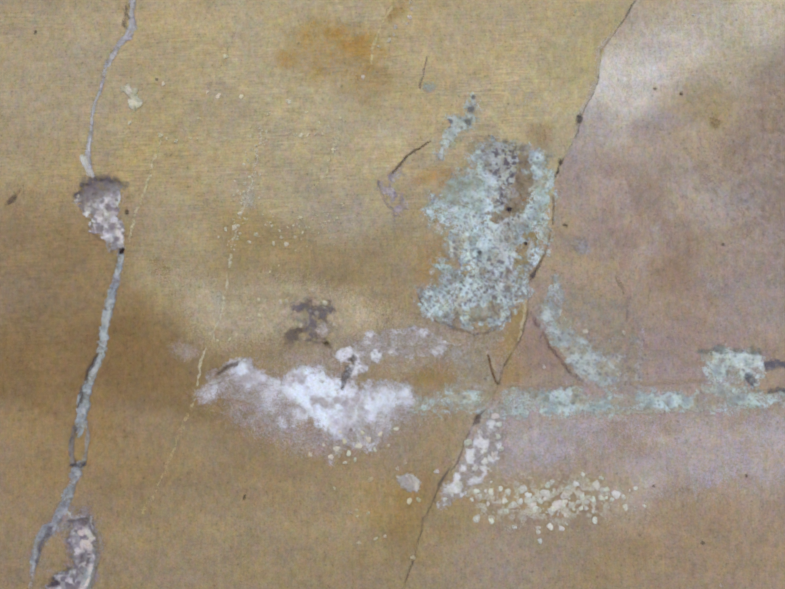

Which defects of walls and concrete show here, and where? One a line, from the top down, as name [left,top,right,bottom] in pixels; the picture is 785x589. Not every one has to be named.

crack [28,140,161,589]
spalling [72,172,130,254]
crack [79,0,139,179]
water stain [0,175,525,482]
spalling [245,287,348,361]
crack [387,140,431,176]
crack [404,1,637,583]
peeling [409,89,785,544]
spalling [25,503,106,589]
flaking render [396,460,421,505]